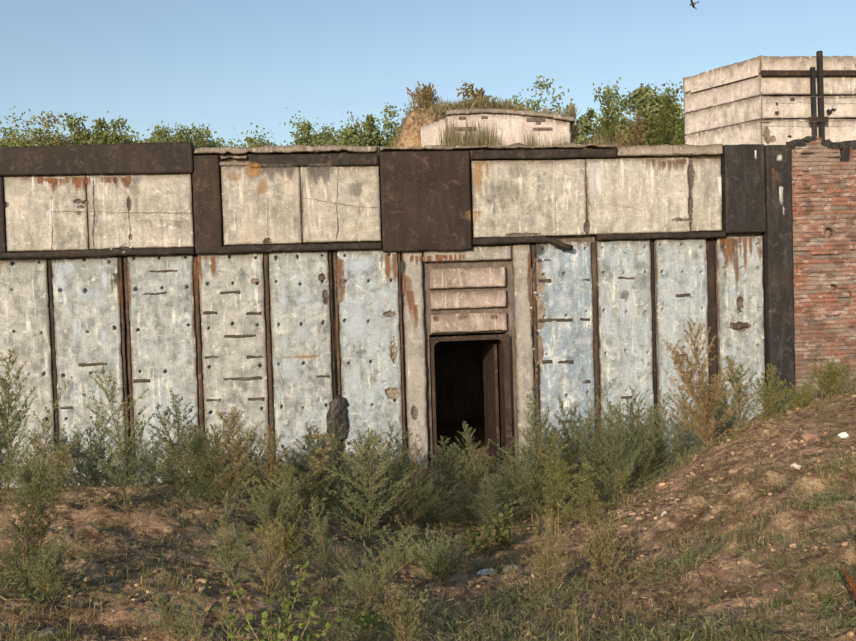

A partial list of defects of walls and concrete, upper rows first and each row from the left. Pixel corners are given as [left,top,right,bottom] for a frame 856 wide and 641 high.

corrosion [37,177,91,189]
corrosion [102,176,131,187]
crack [267,180,379,244]
corrosion [720,238,761,281]
corrosion [385,254,465,321]